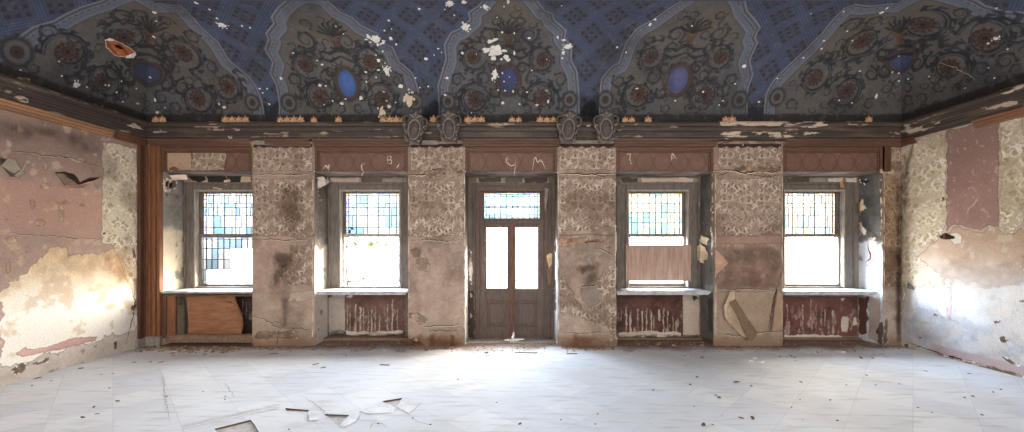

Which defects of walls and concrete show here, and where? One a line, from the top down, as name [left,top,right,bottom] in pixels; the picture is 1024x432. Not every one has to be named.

flaking render [444,0,471,32]
flaking render [364,19,429,118]
flaking render [461,31,528,105]
peeling [718,121,828,146]
crack [716,169,780,177]
water stain [275,255,289,279]
flaking render [692,165,895,337]
flaking render [919,225,1024,284]
flaking render [0,241,137,375]
water stain [331,299,405,336]
water stain [802,299,835,335]
flaking render [932,353,1024,378]